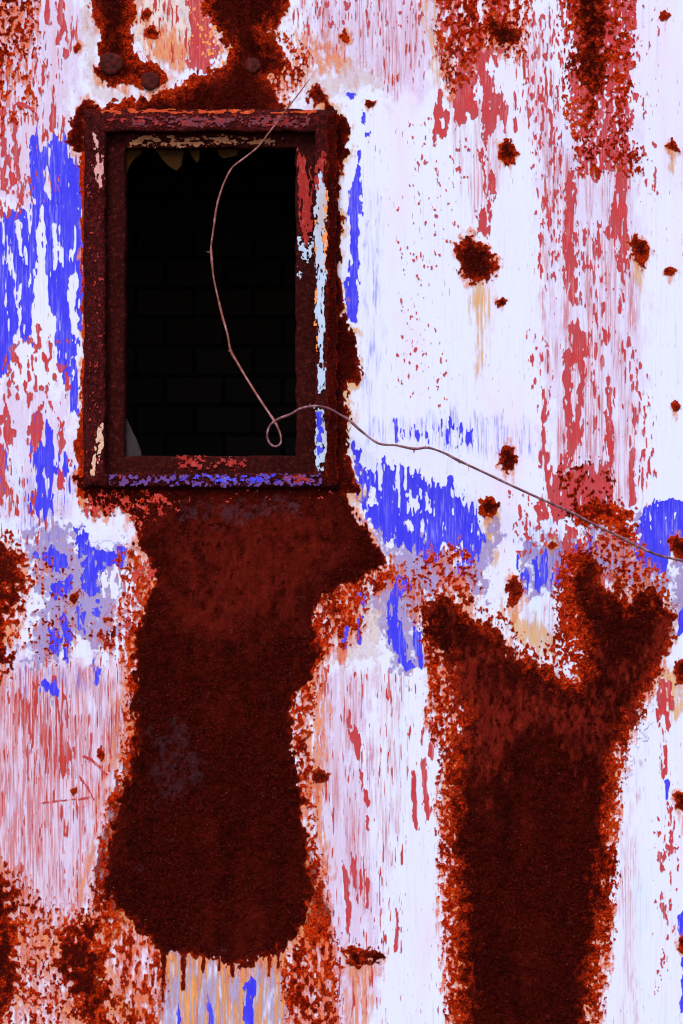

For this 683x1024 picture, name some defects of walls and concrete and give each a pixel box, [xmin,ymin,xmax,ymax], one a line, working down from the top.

peeling [44,0,69,59]
rust [425,0,533,108]
rust [556,0,652,181]
rust [64,0,353,343]
rust [453,227,507,373]
peeling [351,0,683,594]
peeling [0,102,332,664]
rust [495,442,519,478]
rust [0,529,84,688]
peeling [39,677,59,697]
peeling [341,592,366,649]
peeling [386,575,423,671]